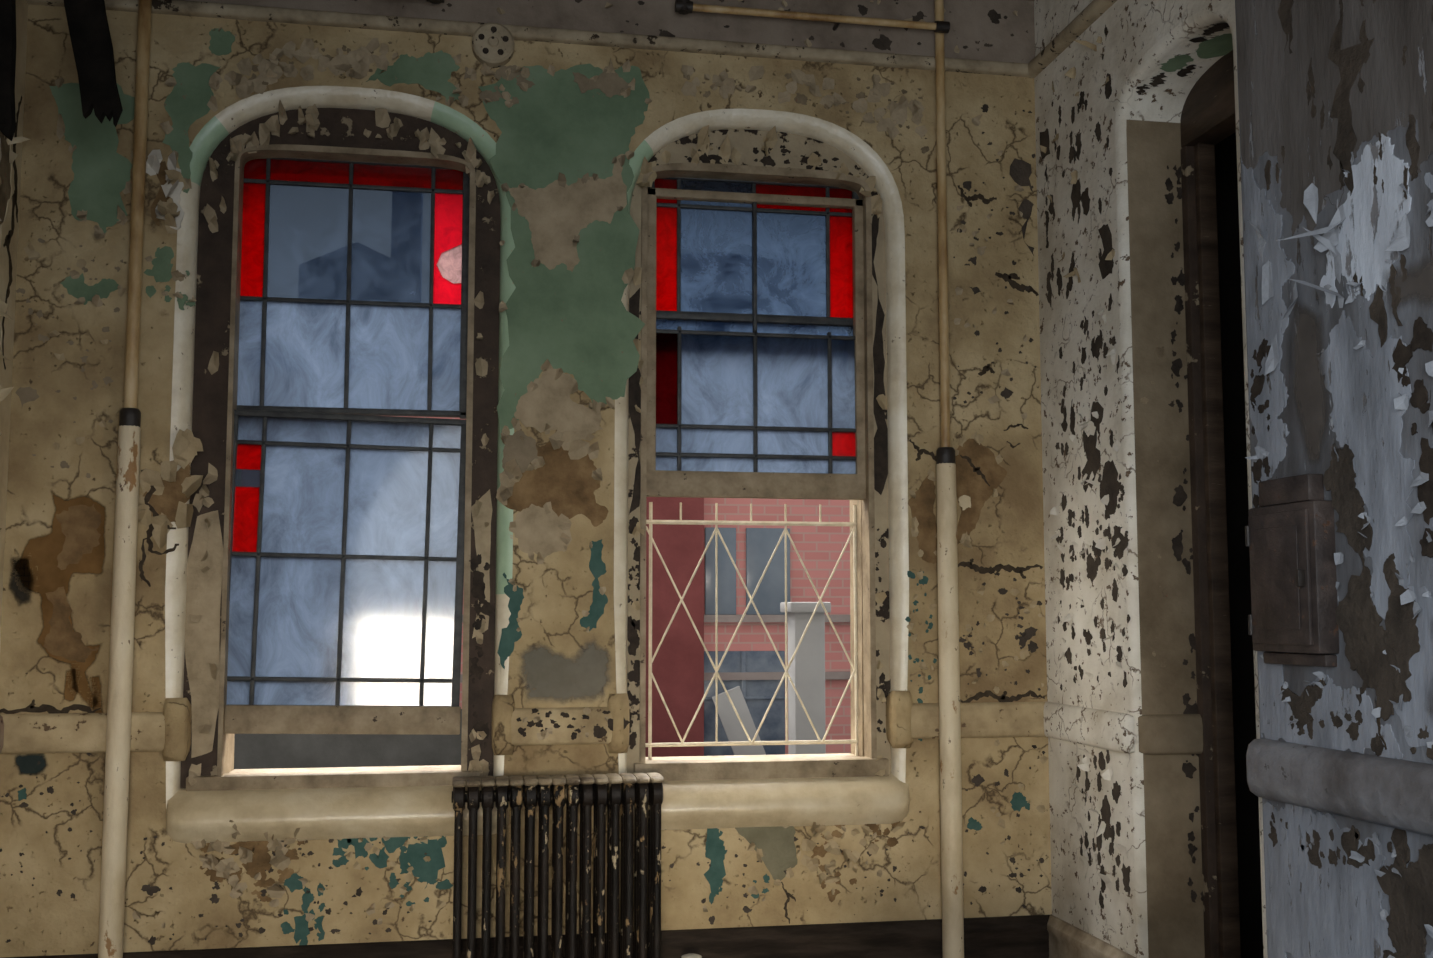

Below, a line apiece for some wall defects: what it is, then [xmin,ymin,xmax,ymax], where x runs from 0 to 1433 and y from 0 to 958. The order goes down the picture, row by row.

crack [957,185,997,207]
peeling [0,27,892,562]
crack [995,272,1039,296]
crack [909,439,990,487]
crack [978,364,995,376]
crack [1004,424,1028,448]
peeling [1136,0,1433,760]
flaking render [468,423,609,777]
crack [958,558,1043,579]
peeling [191,820,453,945]
peeling [1072,748,1131,909]
flaking render [1268,812,1433,958]